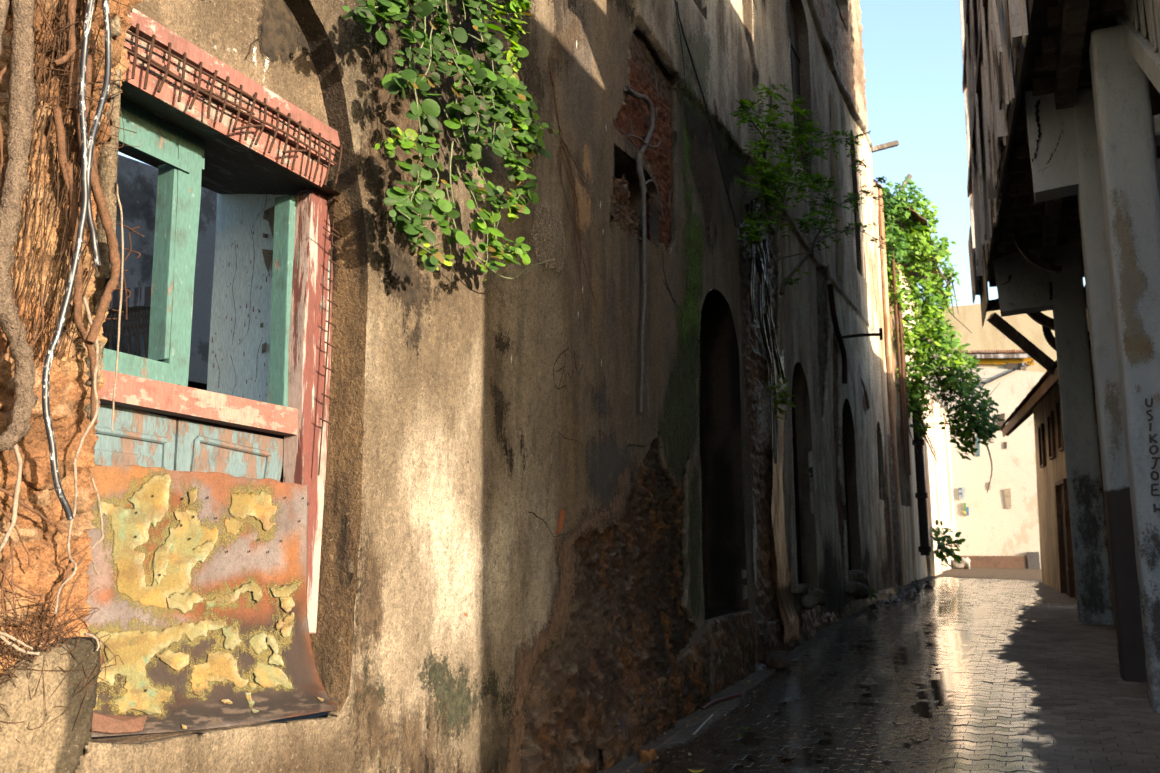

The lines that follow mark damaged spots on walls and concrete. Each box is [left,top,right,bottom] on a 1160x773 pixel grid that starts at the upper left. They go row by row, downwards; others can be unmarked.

damp [514,0,586,174]
flaking render [609,31,673,249]
crack [1032,98,1063,172]
flaking render [0,0,343,719]
flaking render [737,210,783,621]
peeling [1112,189,1154,365]
peeling [503,455,644,773]
damp [1071,470,1111,619]
damp [1138,524,1160,571]
damp [1140,585,1160,660]